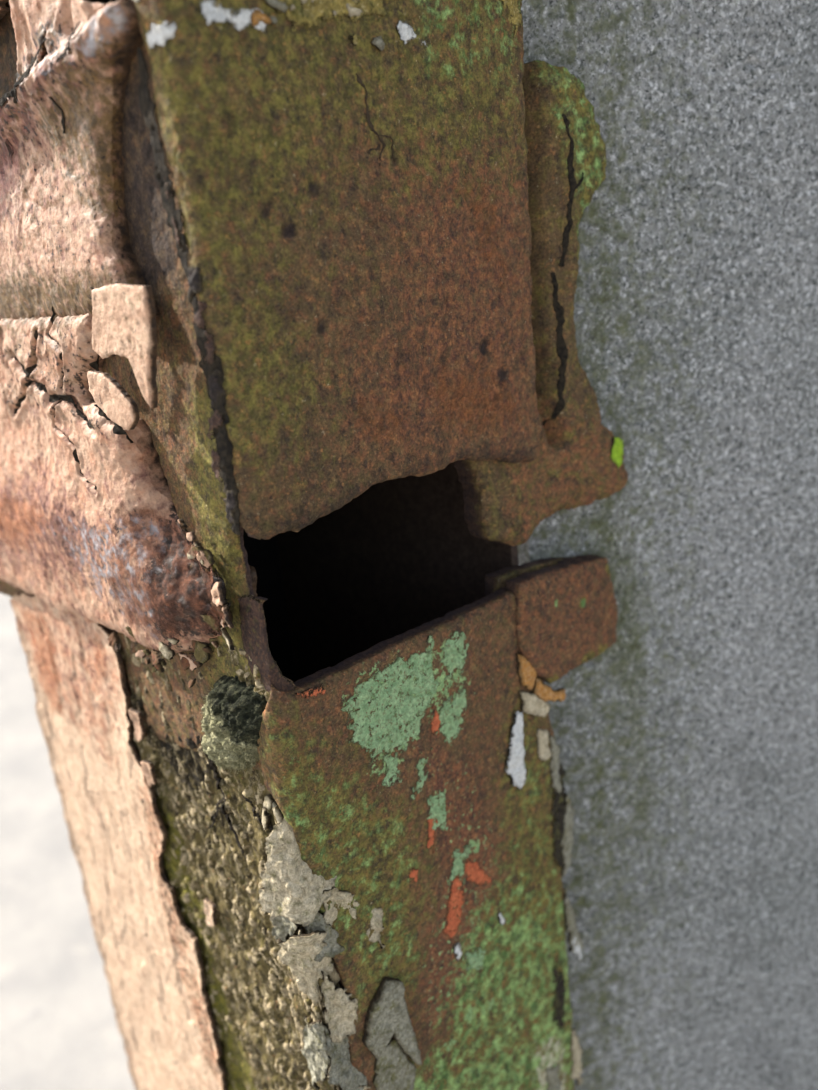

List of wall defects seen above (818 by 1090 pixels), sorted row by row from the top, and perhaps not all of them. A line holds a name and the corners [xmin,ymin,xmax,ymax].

peeling [0,0,108,81]
crack [542,114,584,427]
peeling [87,283,158,431]
corrosion [107,509,235,688]
peeling [128,708,146,742]
peeling [140,760,158,787]
peeling [203,897,217,927]
spalling [258,794,386,1090]